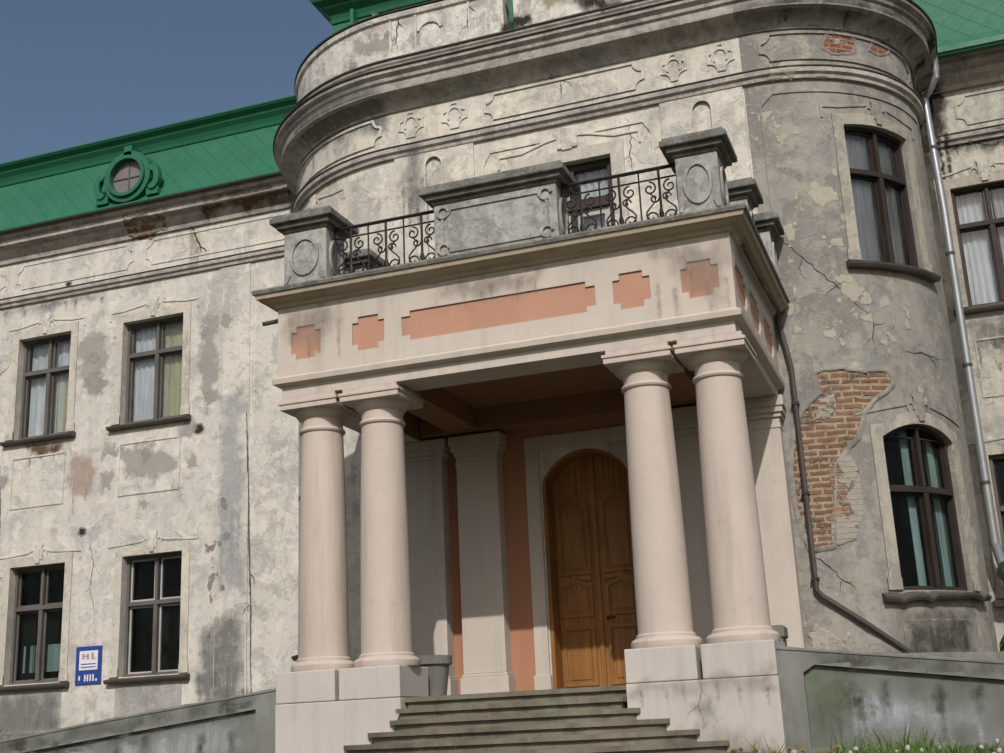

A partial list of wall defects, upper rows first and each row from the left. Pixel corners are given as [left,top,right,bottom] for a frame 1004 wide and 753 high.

flaking render [820,27,892,56]
peeling [767,60,806,90]
spalling [122,213,169,240]
crack [785,243,884,350]
flaking render [786,363,896,553]